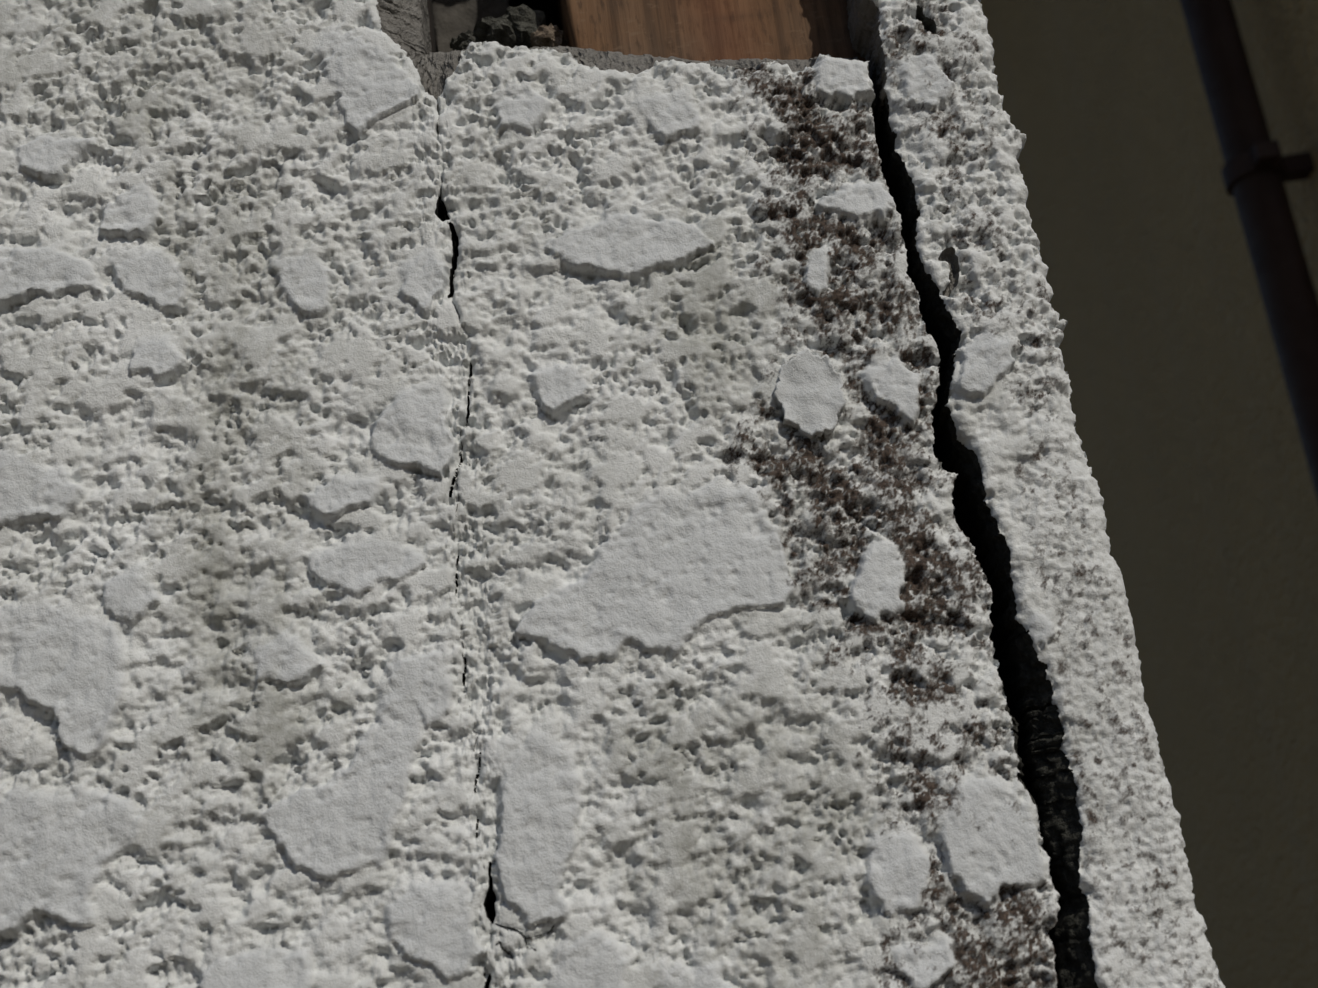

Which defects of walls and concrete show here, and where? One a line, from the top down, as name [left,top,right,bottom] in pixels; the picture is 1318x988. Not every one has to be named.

spalling [376,0,469,100]
spalling [529,46,819,74]
spalling [843,0,887,133]
crack [435,177,460,319]
damp [883,0,1063,415]
damp [724,62,1014,834]
crack [871,94,1098,988]
crack [449,362,554,988]
damp [877,856,1058,988]